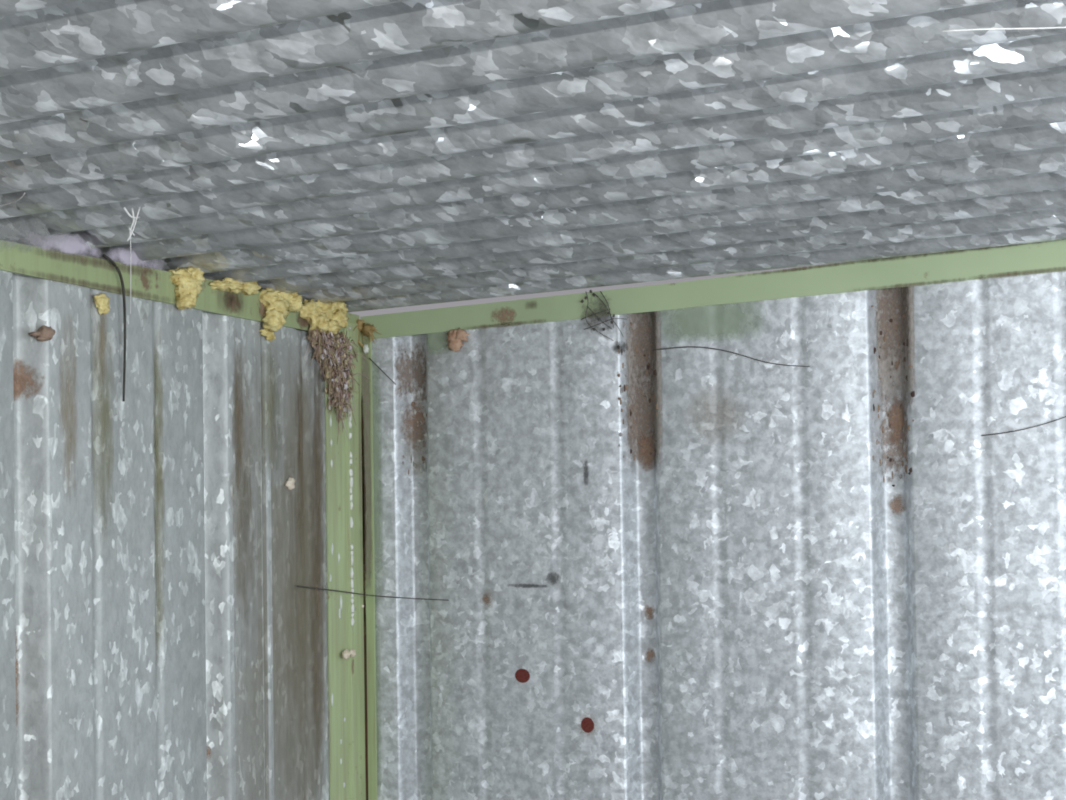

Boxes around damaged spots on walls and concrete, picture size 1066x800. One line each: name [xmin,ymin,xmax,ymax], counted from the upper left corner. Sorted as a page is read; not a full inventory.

corrosion [980,269,1056,278]
corrosion [13,362,38,398]
corrosion [395,345,427,475]
corrosion [617,311,662,468]
corrosion [871,282,936,513]